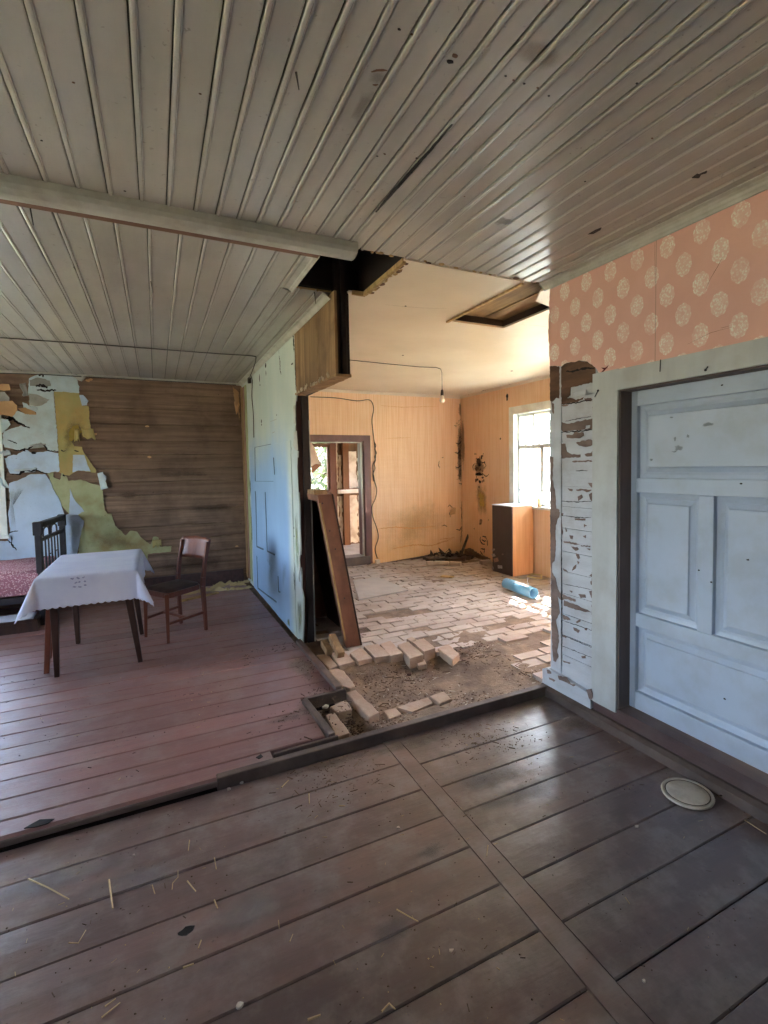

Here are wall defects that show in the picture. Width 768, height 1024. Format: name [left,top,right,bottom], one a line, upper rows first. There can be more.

peeling [0,373,108,560]
water stain [454,405,489,555]
peeling [547,360,596,700]